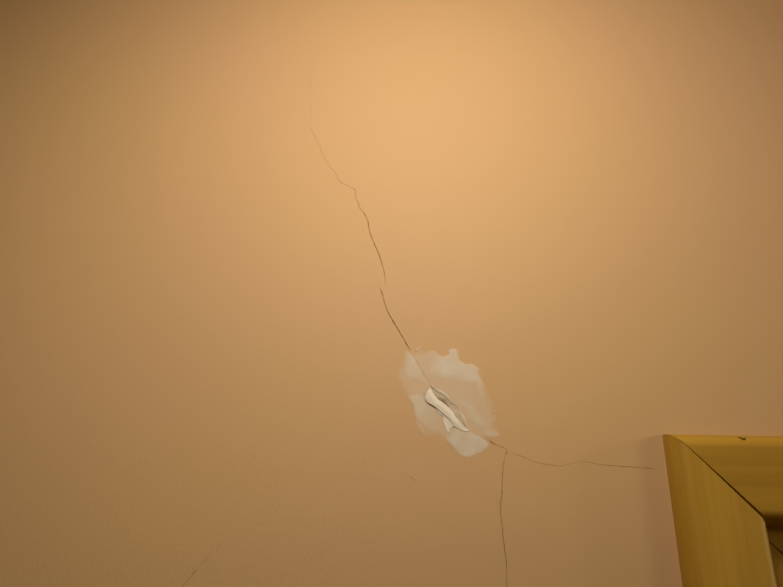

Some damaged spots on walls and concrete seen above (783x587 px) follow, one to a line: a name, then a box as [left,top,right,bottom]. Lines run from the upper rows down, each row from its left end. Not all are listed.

spalling [425,384,469,432]